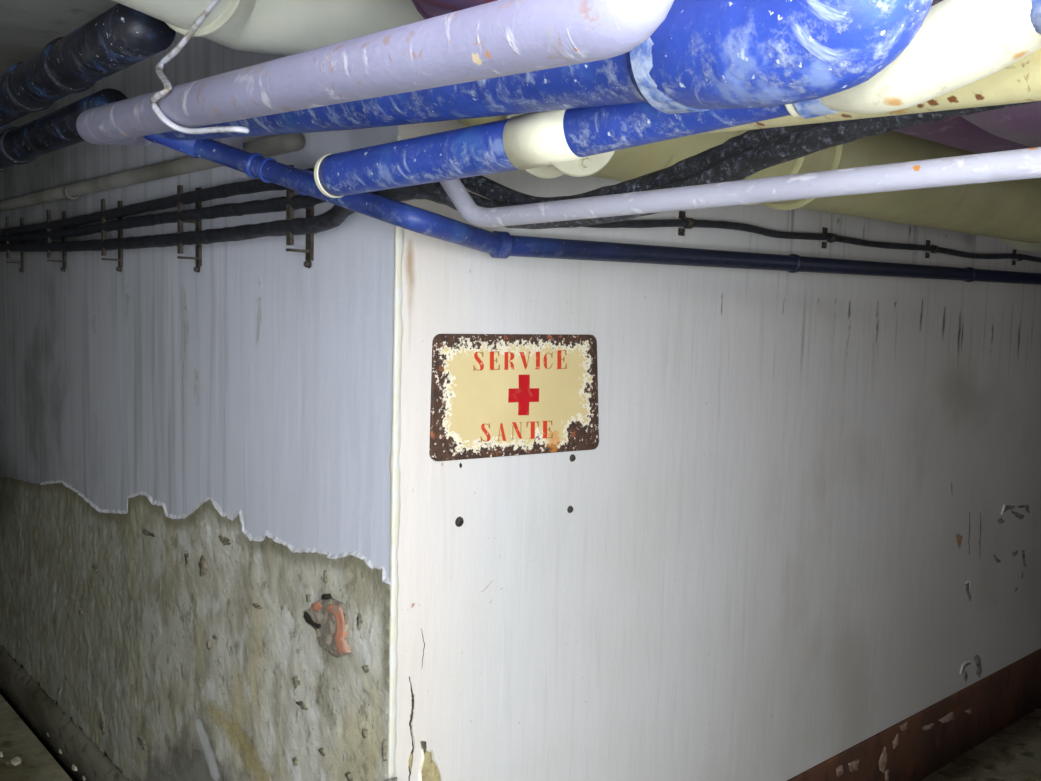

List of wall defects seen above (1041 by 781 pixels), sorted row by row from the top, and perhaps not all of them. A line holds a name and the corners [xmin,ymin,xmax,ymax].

flaking render [0,226,404,781]
peeling [997,503,1030,524]
peeling [960,655,982,682]
crack [408,628,425,781]
peeling [922,708,972,731]
flaking render [418,741,442,781]
peeling [836,759,860,777]
peeling [879,722,908,781]